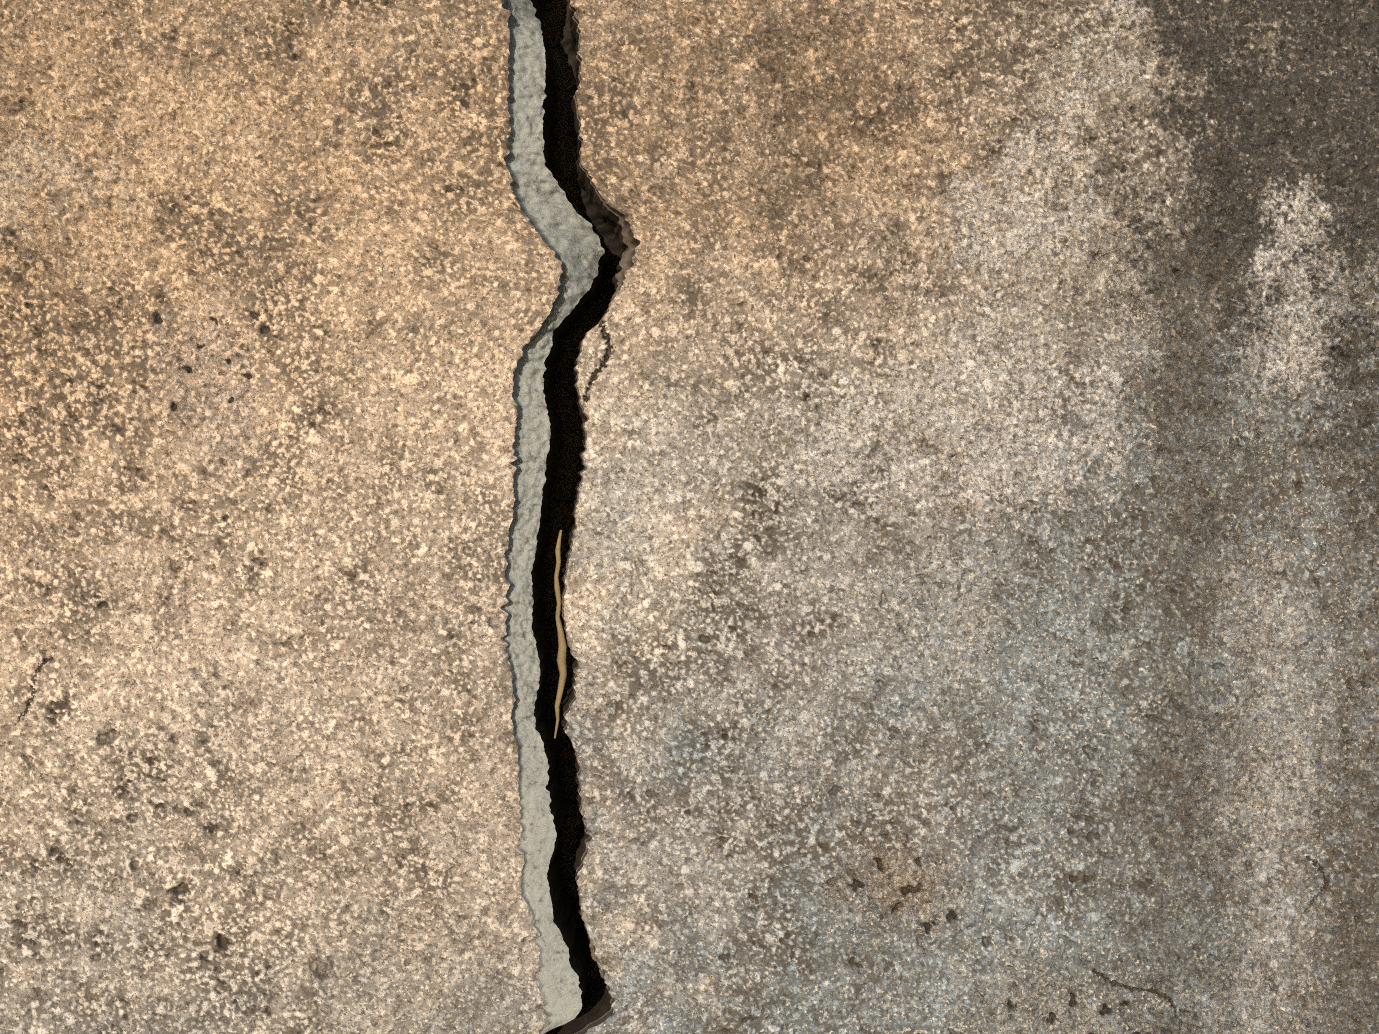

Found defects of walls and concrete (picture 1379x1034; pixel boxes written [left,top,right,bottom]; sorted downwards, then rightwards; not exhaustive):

crack [501,0,640,1034]